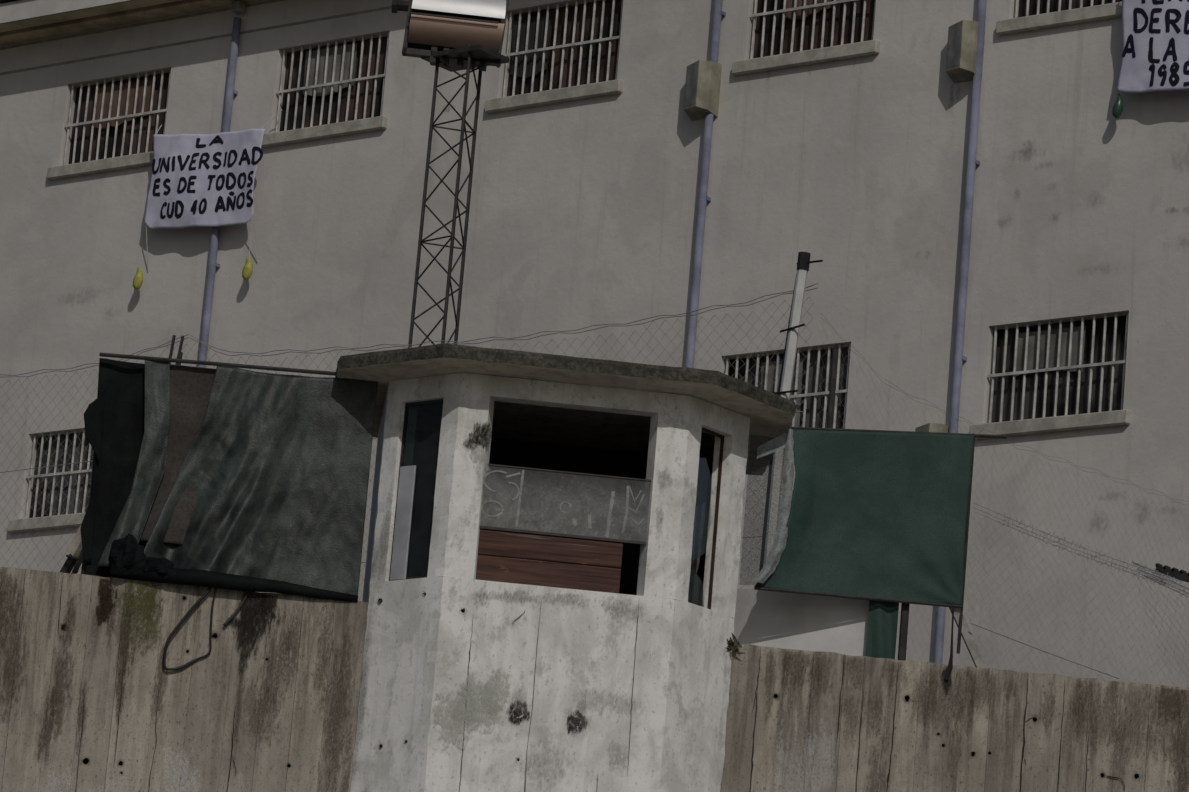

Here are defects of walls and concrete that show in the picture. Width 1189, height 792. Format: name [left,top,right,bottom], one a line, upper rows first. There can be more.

water stain [38,597,85,758]
water stain [107,596,167,713]
water stain [228,593,261,675]
spalling [509,700,530,724]
spalling [567,710,588,733]